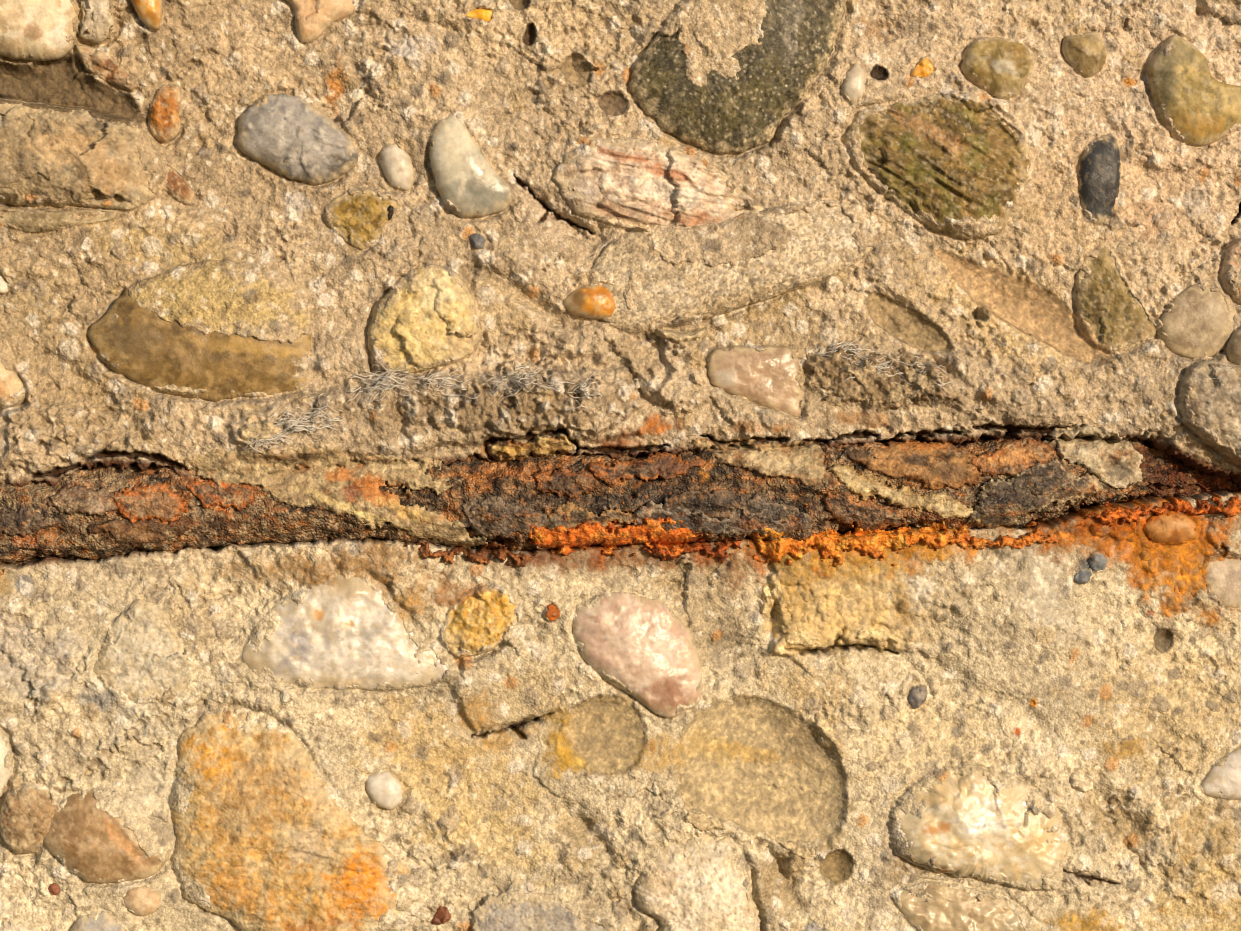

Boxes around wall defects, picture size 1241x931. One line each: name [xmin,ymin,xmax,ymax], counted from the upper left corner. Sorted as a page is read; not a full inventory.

crack [483,428,669,458]
rust [604,415,671,444]
crack [702,423,1073,446]
crack [33,450,191,477]
spalling [0,420,1241,656]
rust [1026,498,1233,617]
rust [696,529,977,642]